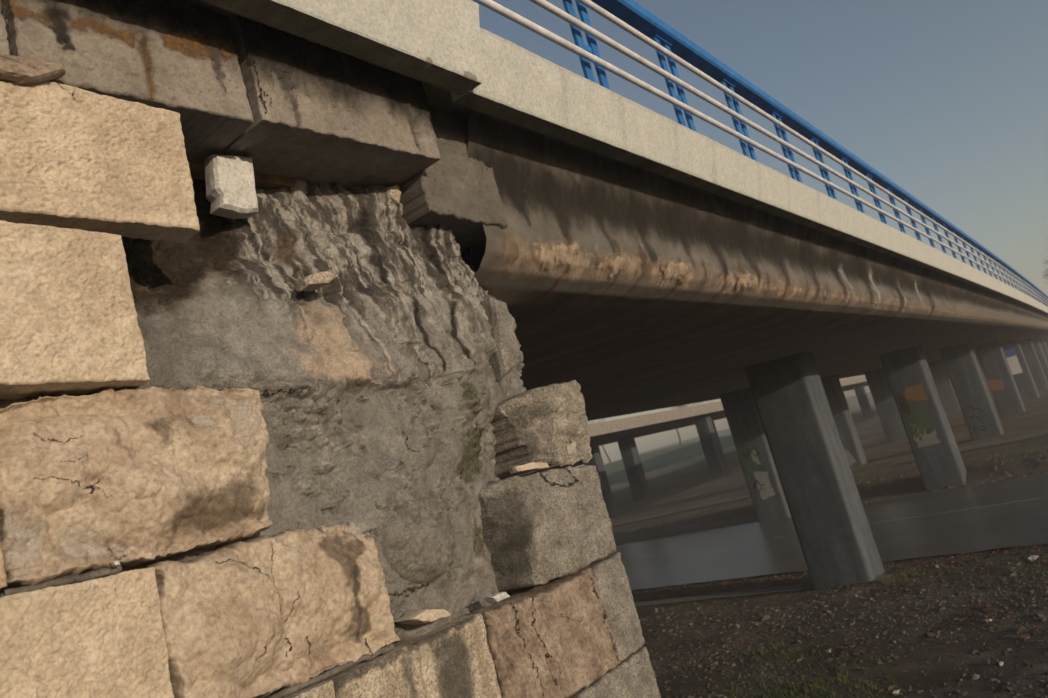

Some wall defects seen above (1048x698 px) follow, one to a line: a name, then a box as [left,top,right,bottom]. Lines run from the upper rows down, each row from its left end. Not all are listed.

crack [1,0,11,55]
corrosion [71,18,155,102]
corrosion [162,34,234,59]
crack [235,46,272,115]
water stain [468,146,1045,327]
spalling [59,178,527,641]
spalling [1,510,43,579]
crack [215,544,311,662]
water stain [319,536,370,640]
crack [509,598,563,696]
crack [561,578,619,661]